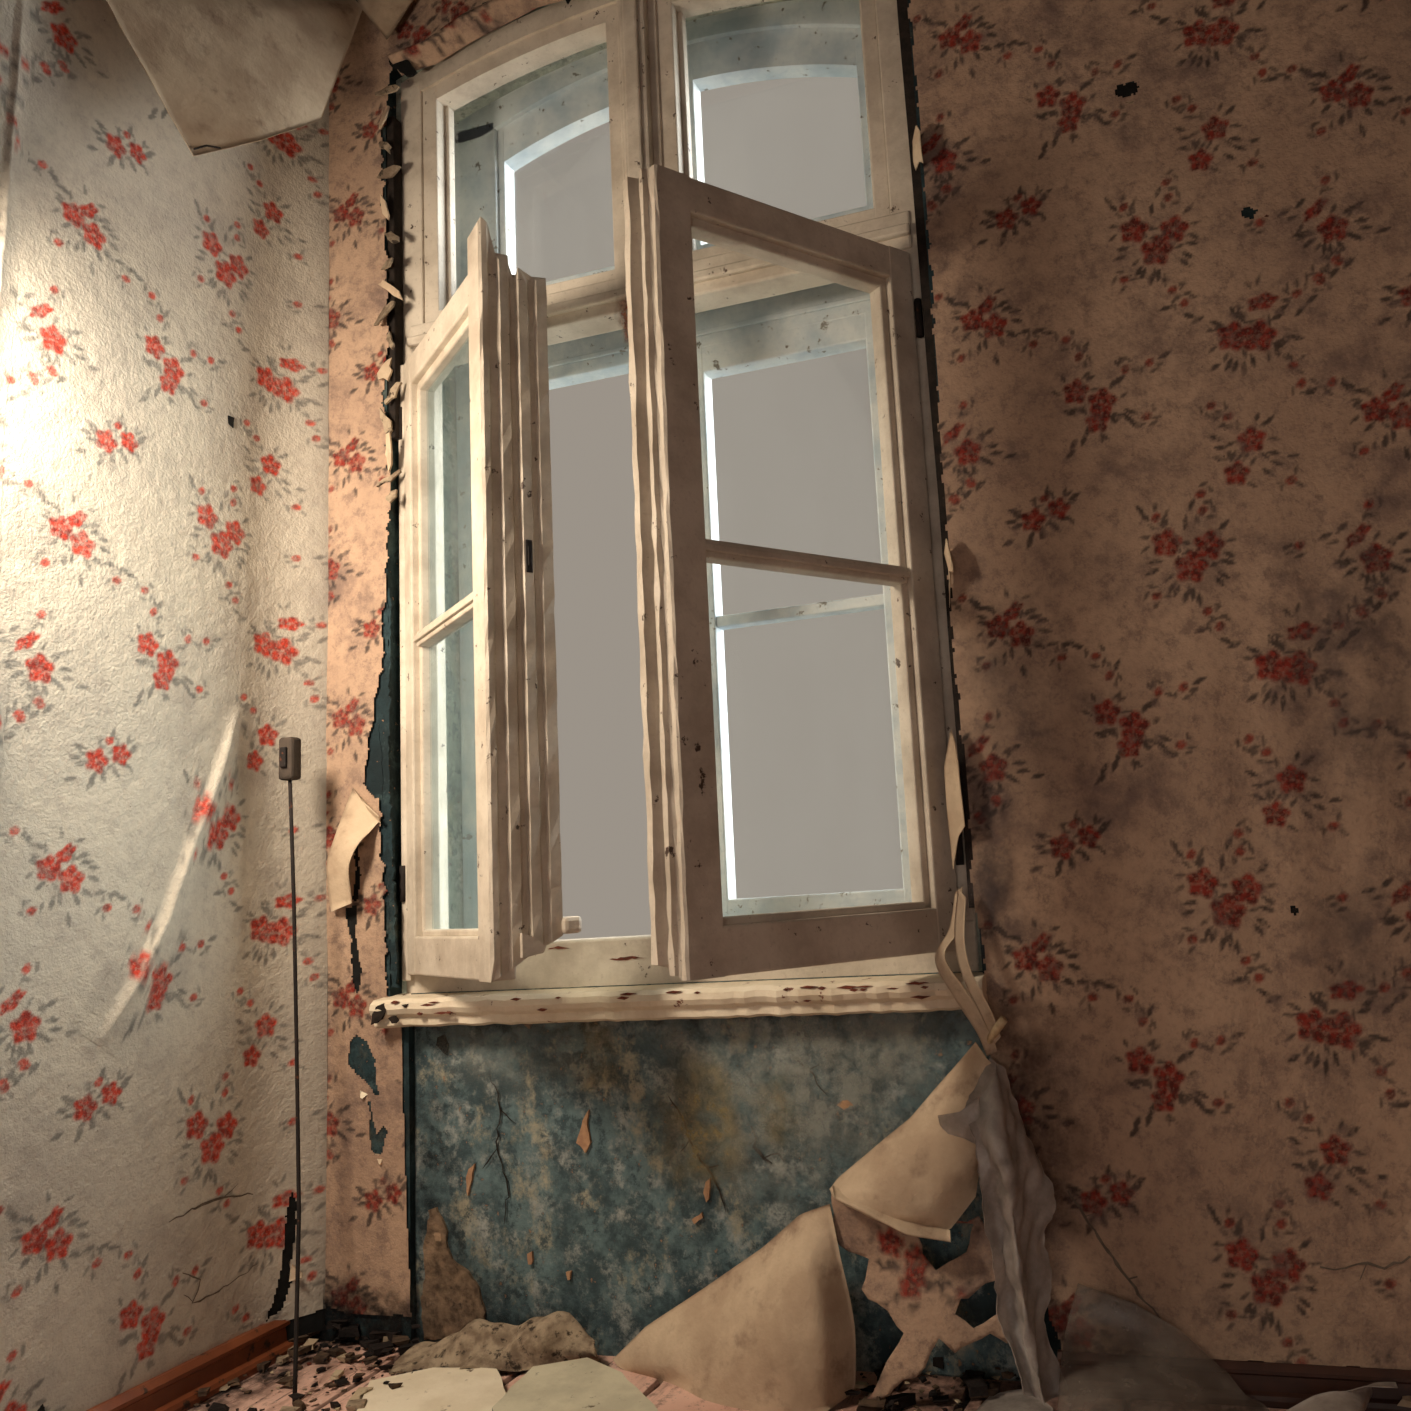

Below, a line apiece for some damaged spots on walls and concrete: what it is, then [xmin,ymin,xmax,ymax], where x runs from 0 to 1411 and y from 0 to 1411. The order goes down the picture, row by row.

peeling [783,985,870,1002]
peeling [887,981,930,999]
peeling [576,1109,592,1153]
peeling [466,1163,476,1196]
peeling [692,1178,711,1224]
flaking render [420,1207,486,1340]